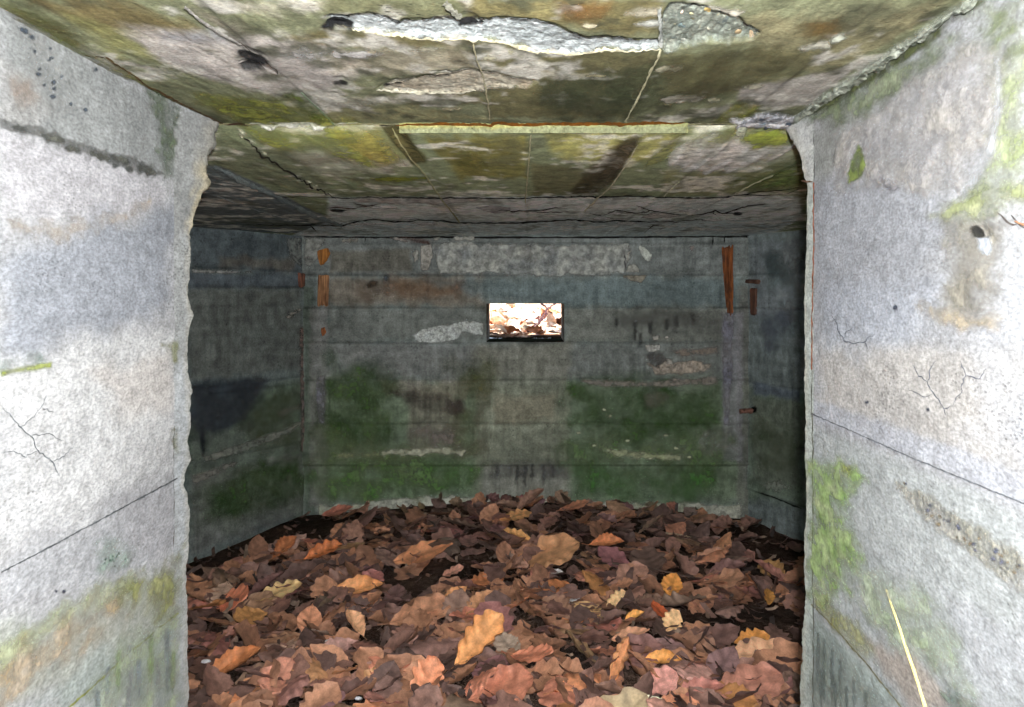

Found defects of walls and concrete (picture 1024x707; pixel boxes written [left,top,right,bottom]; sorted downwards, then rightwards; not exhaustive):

spalling [330,2,761,56]
peeling [668,0,978,174]
spalling [413,321,483,343]
peeling [393,236,652,283]
crack [85,55,1024,543]
crack [3,394,74,473]
damp [191,376,301,483]